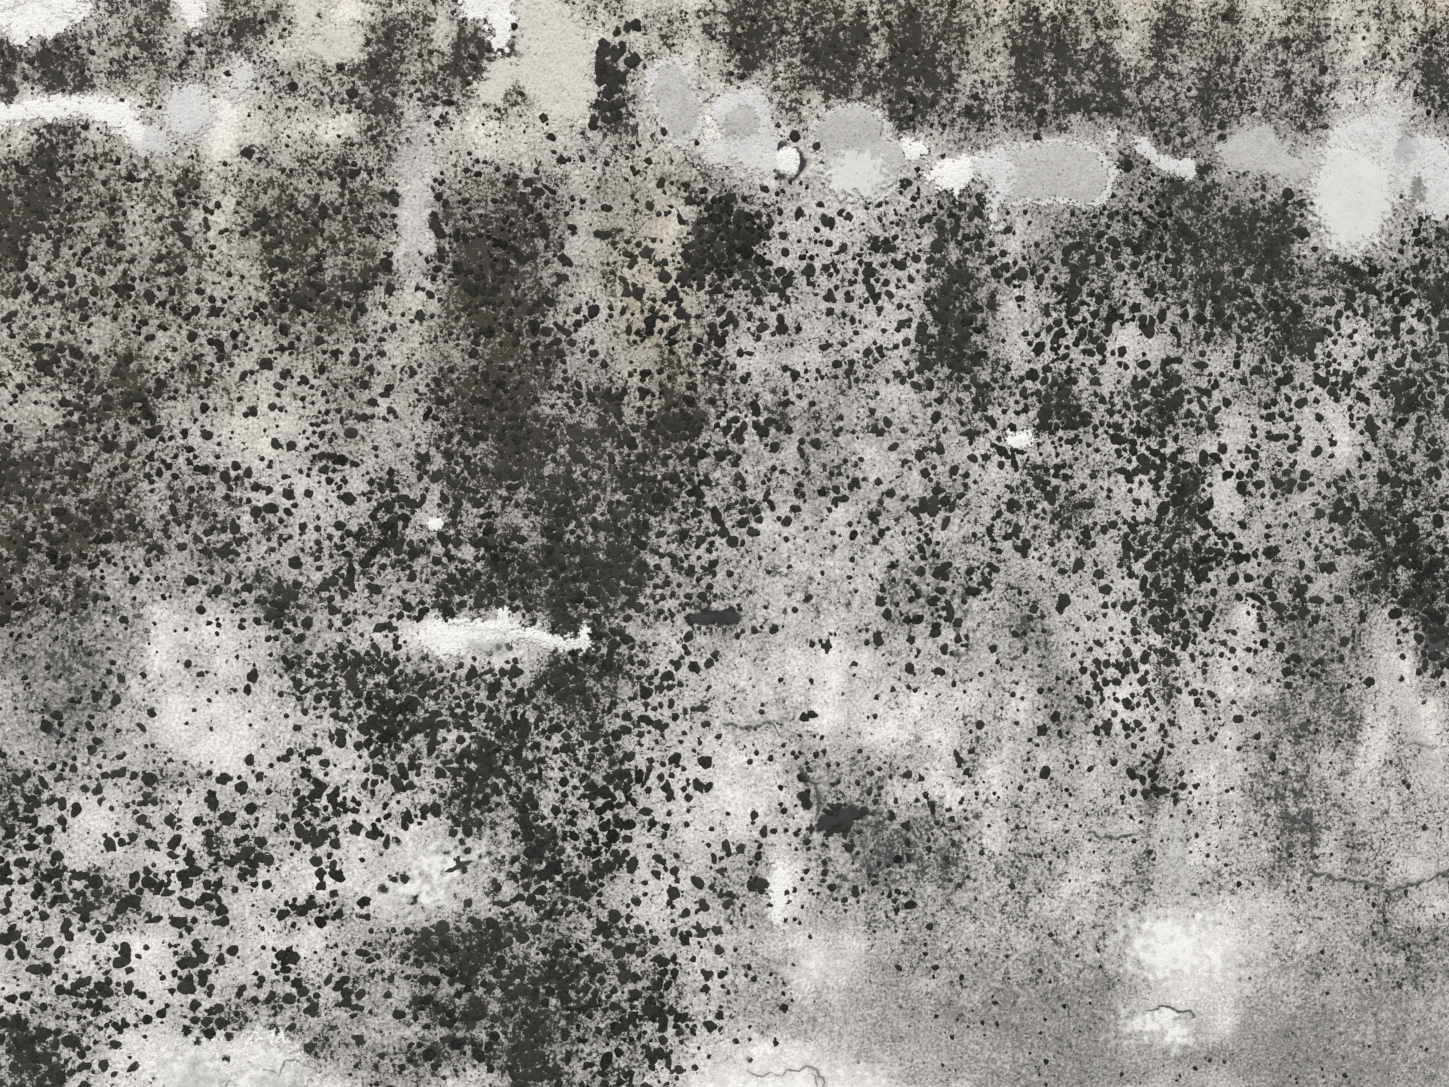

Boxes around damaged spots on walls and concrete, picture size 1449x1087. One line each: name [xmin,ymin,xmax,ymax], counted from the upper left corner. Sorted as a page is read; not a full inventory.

spalling [410,605,598,663]
water stain [177,652,217,688]
water stain [377,865,428,895]
crack [747,1065,825,1086]
water stain [997,1002,1068,1087]
water stain [1267,1015,1410,1087]